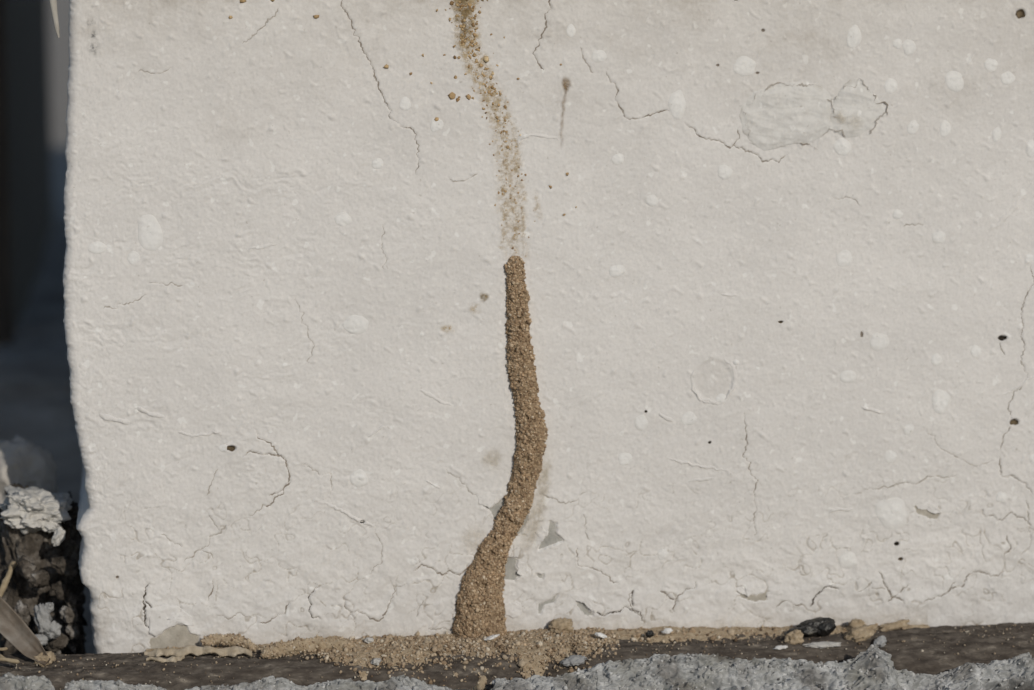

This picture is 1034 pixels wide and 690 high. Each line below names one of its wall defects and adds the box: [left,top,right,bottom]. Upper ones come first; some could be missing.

crack [341,1,419,173]
crack [580,47,788,163]
crack [143,585,152,628]
crack [161,430,332,561]
crack [225,586,320,624]
crack [344,586,395,622]
crack [416,558,469,576]
spalling [504,557,543,580]
spalling [534,521,562,549]
crack [543,492,644,621]
crack [743,414,758,533]
crack [777,267,1034,607]